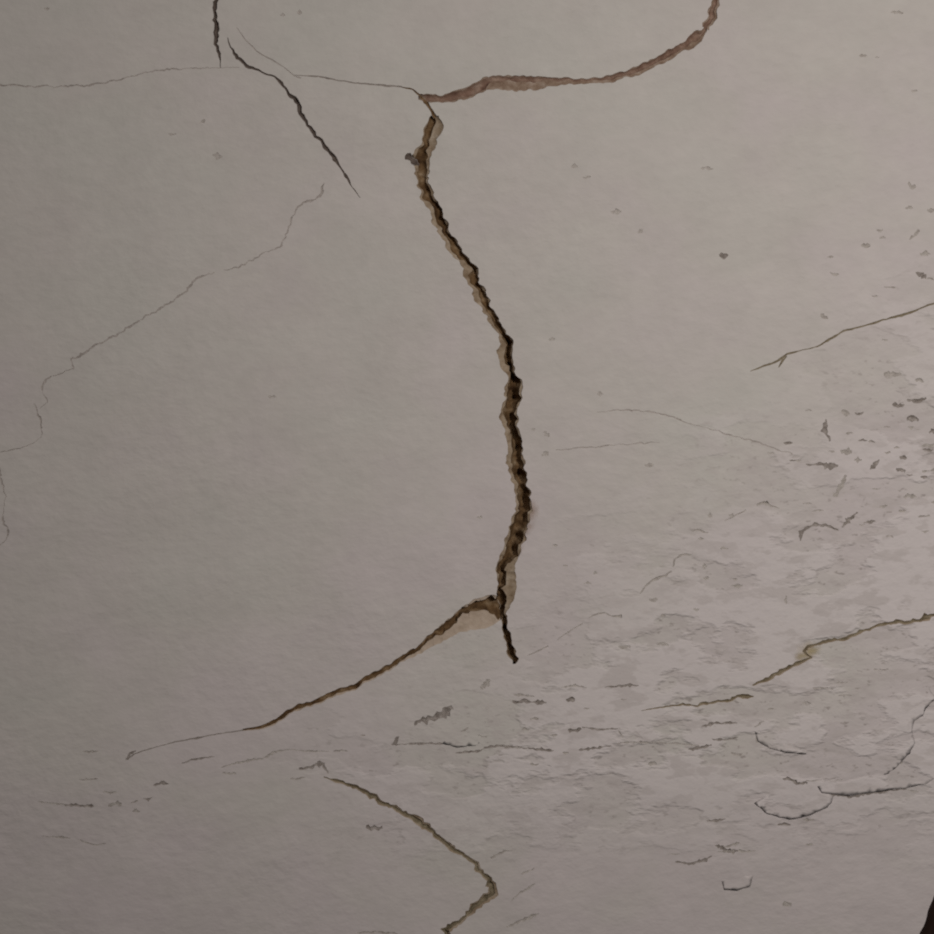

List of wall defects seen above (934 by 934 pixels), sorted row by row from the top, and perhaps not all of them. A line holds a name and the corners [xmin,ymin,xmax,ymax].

crack [0,0,720,760]
crack [751,303,934,371]
crack [602,409,792,454]
crack [692,501,779,533]
crack [641,613,934,711]
crack [324,777,498,934]